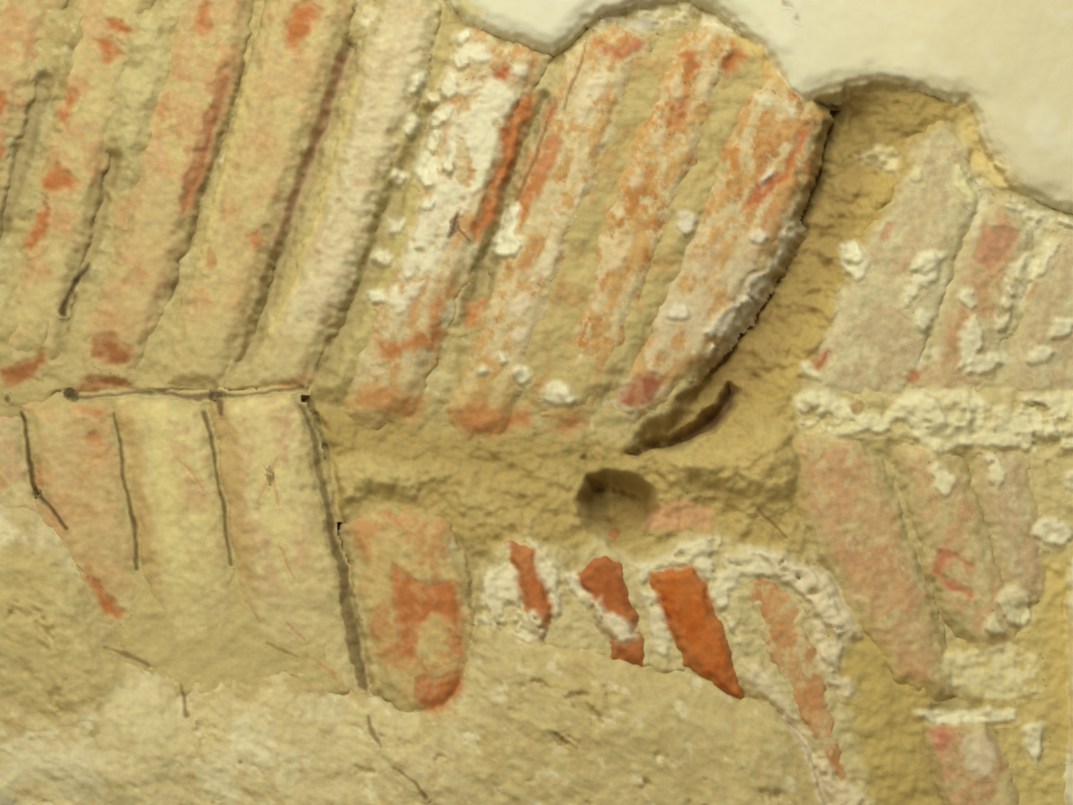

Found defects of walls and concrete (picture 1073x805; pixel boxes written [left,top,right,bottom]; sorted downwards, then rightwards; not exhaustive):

crack [16,407,72,533]
flaking render [0,0,265,467]
flaking render [76,557,350,695]
crack [61,381,432,803]
flaking render [224,0,1073,805]